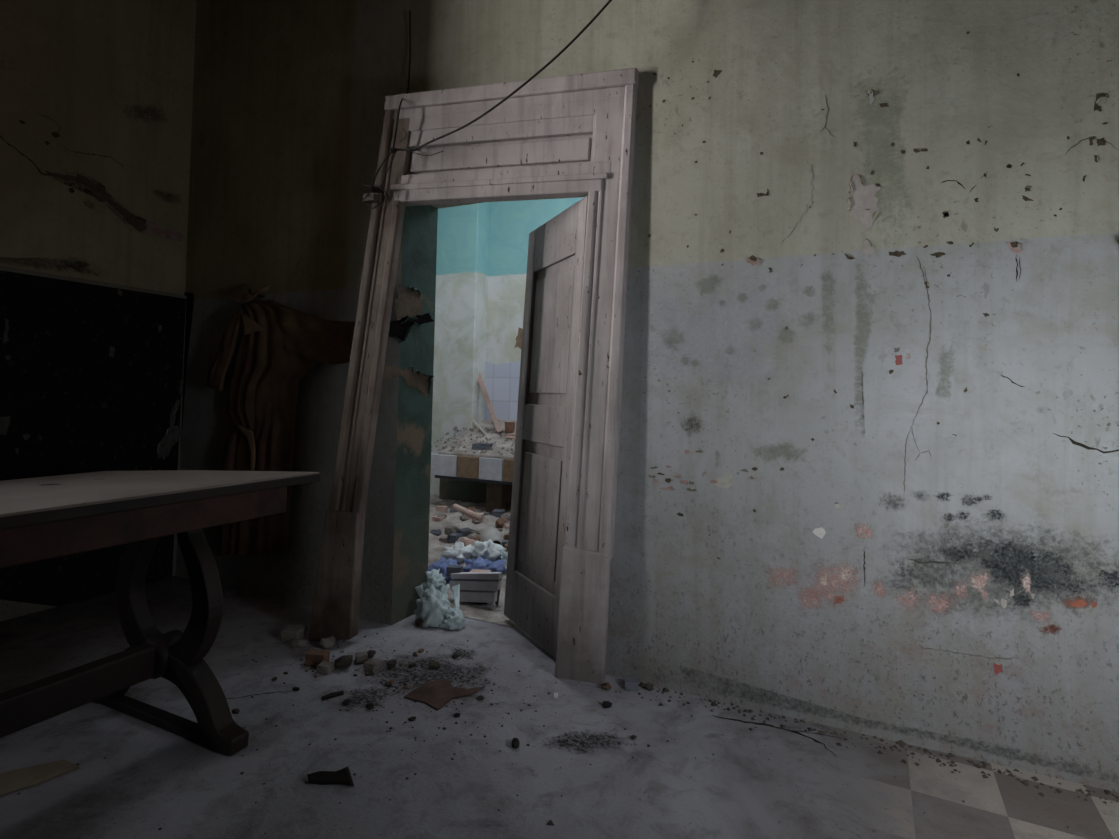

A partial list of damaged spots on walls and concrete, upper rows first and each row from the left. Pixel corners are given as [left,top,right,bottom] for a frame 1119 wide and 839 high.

crack [0,114,183,243]
peeling [847,170,881,230]
spalling [389,313,434,343]
spalling [383,364,434,398]
crack [903,257,931,493]
crack [1053,433,1119,453]
leakage [901,493,1119,610]